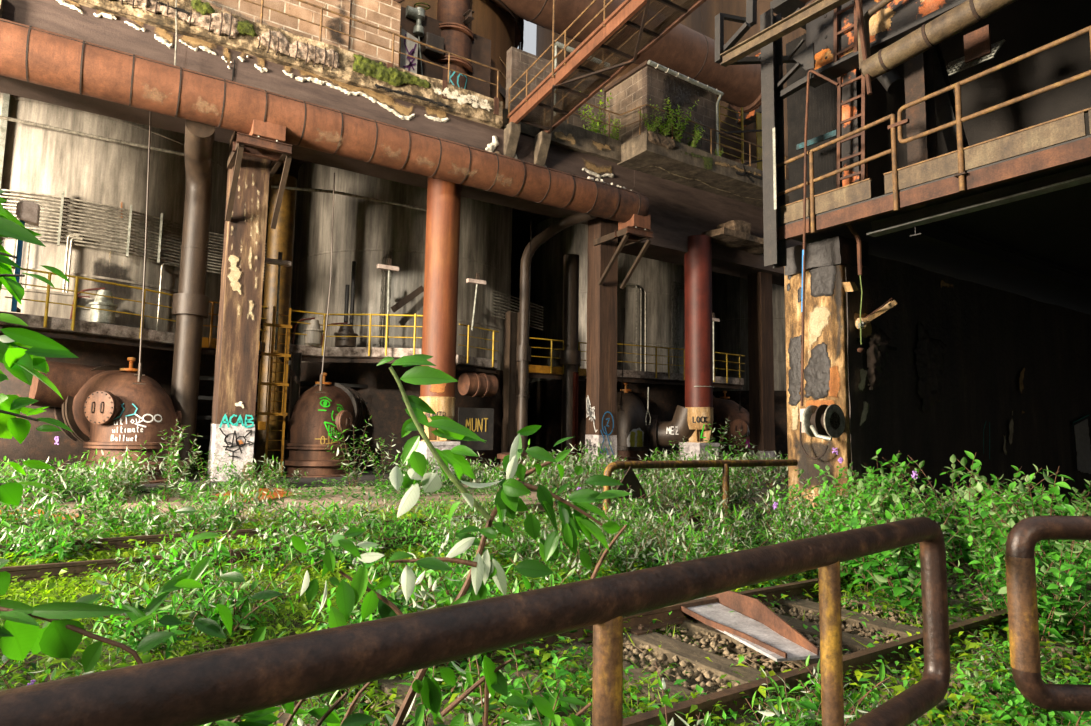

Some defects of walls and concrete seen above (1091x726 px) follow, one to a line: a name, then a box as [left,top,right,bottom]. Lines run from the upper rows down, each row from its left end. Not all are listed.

peeling [228,255,254,320]
peeling [808,307,830,353]
corrosion [430,383,446,393]